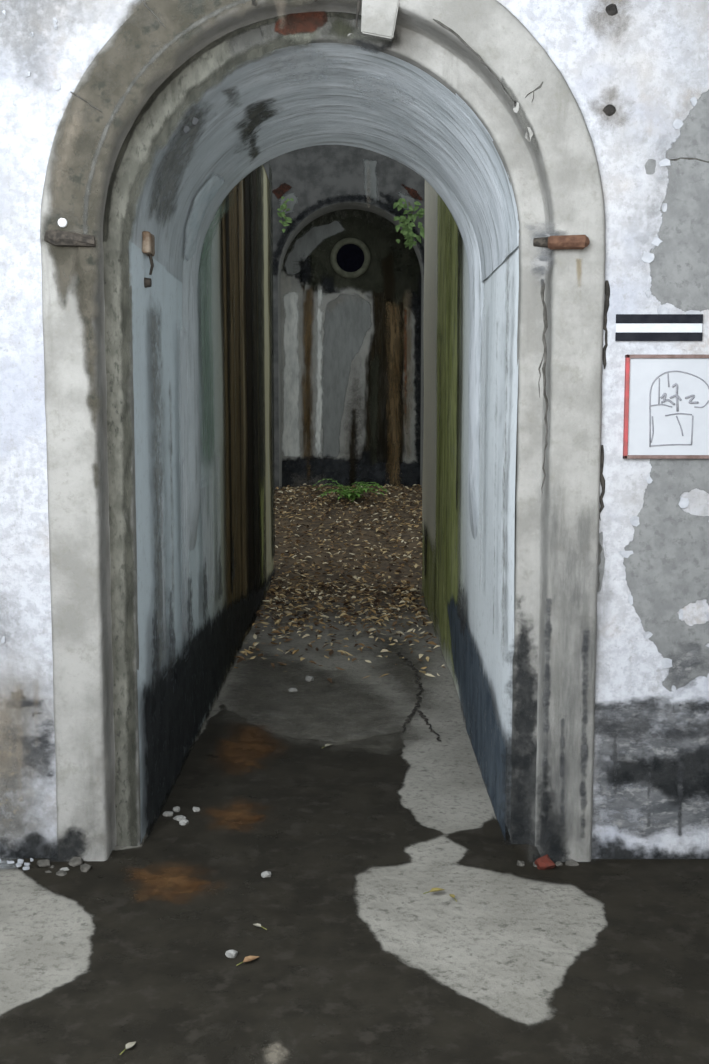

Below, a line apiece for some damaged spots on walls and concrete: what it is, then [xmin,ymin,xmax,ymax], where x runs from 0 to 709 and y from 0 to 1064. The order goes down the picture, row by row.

water stain [42,0,260,424]
spalling [641,90,709,314]
water stain [103,12,400,846]
water stain [272,193,424,487]
water stain [495,263,509,512]
water stain [0,310,709,1064]
crack [397,652,441,741]
spalling [597,532,605,592]
spalling [619,459,709,693]